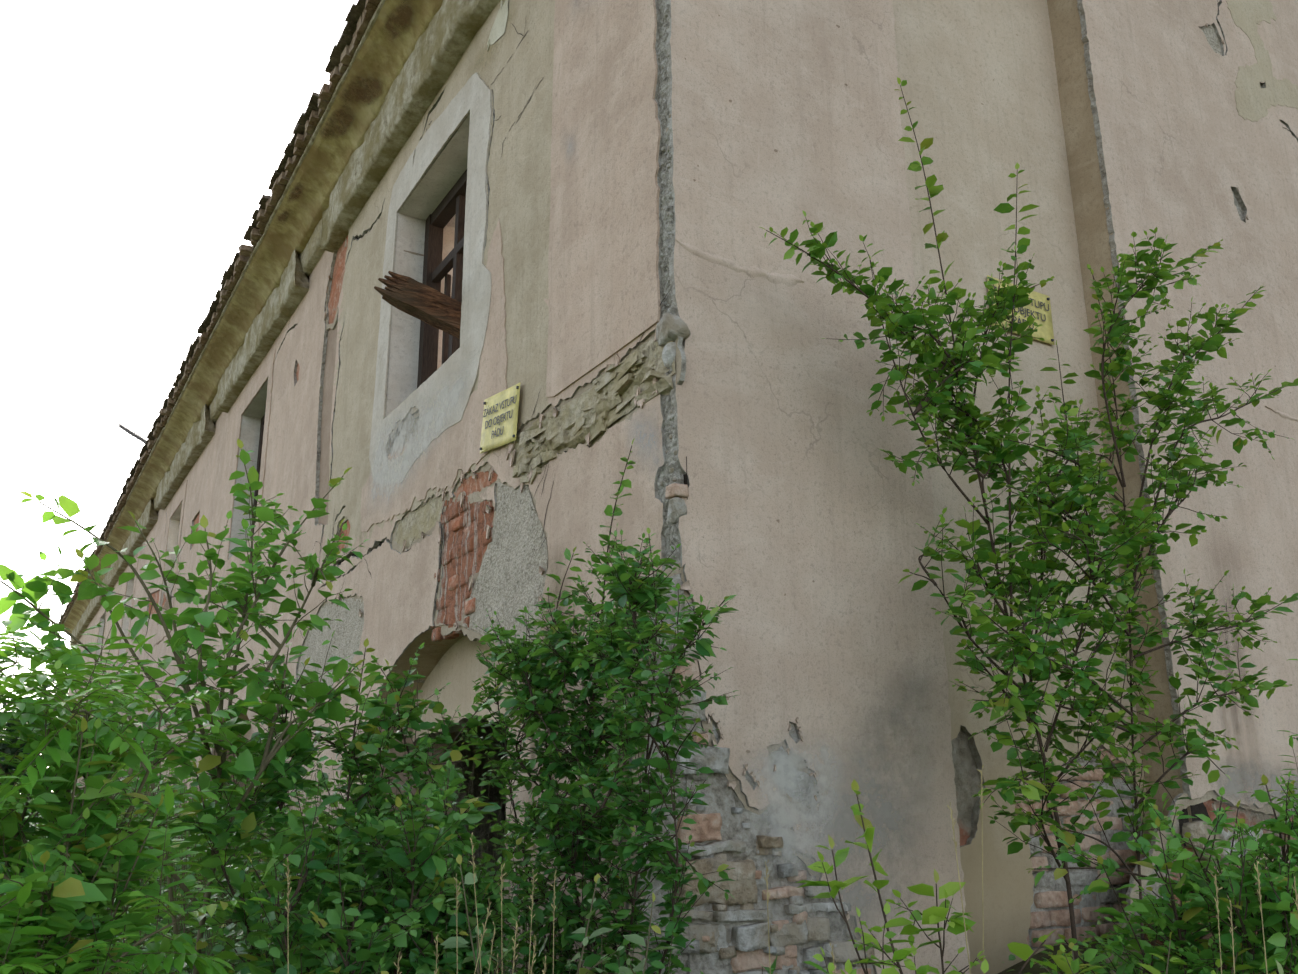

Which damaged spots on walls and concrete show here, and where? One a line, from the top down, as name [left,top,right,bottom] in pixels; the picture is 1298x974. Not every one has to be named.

peeling [1226,0,1298,122]
peeling [324,235,348,330]
flaking render [387,0,875,974]